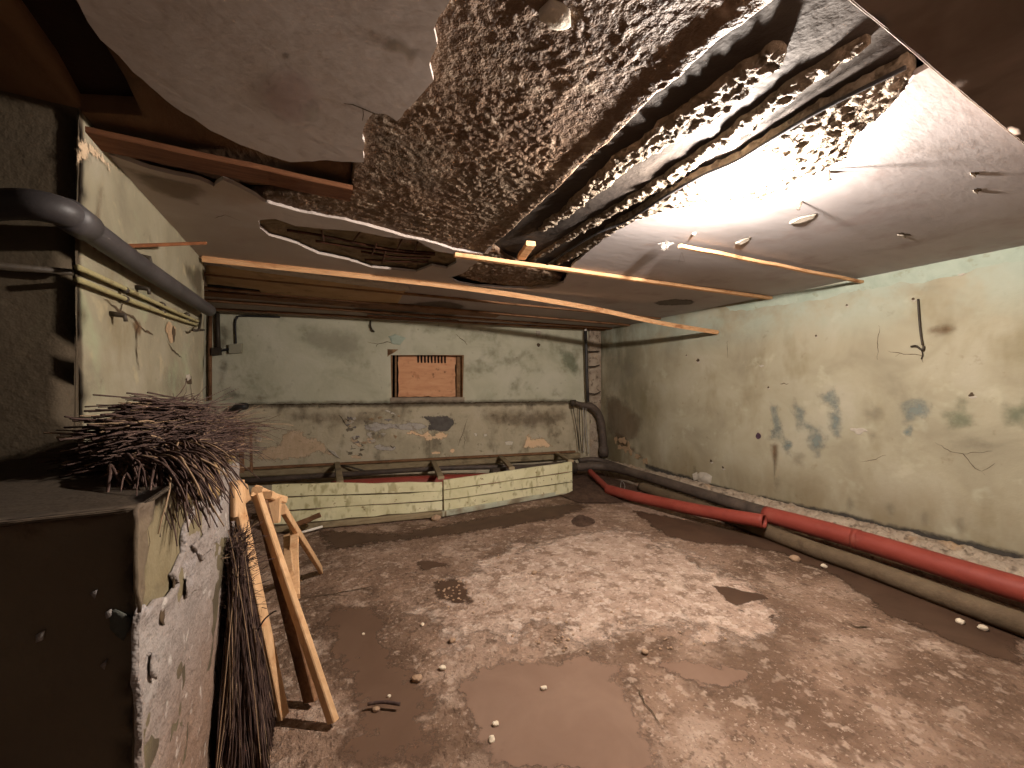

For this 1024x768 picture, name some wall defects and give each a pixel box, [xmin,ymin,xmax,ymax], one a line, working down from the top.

peeling [539,0,571,31]
peeling [77,141,110,171]
peeling [789,213,818,224]
spalling [259,219,456,270]
peeling [346,410,455,459]
peeling [505,434,553,448]